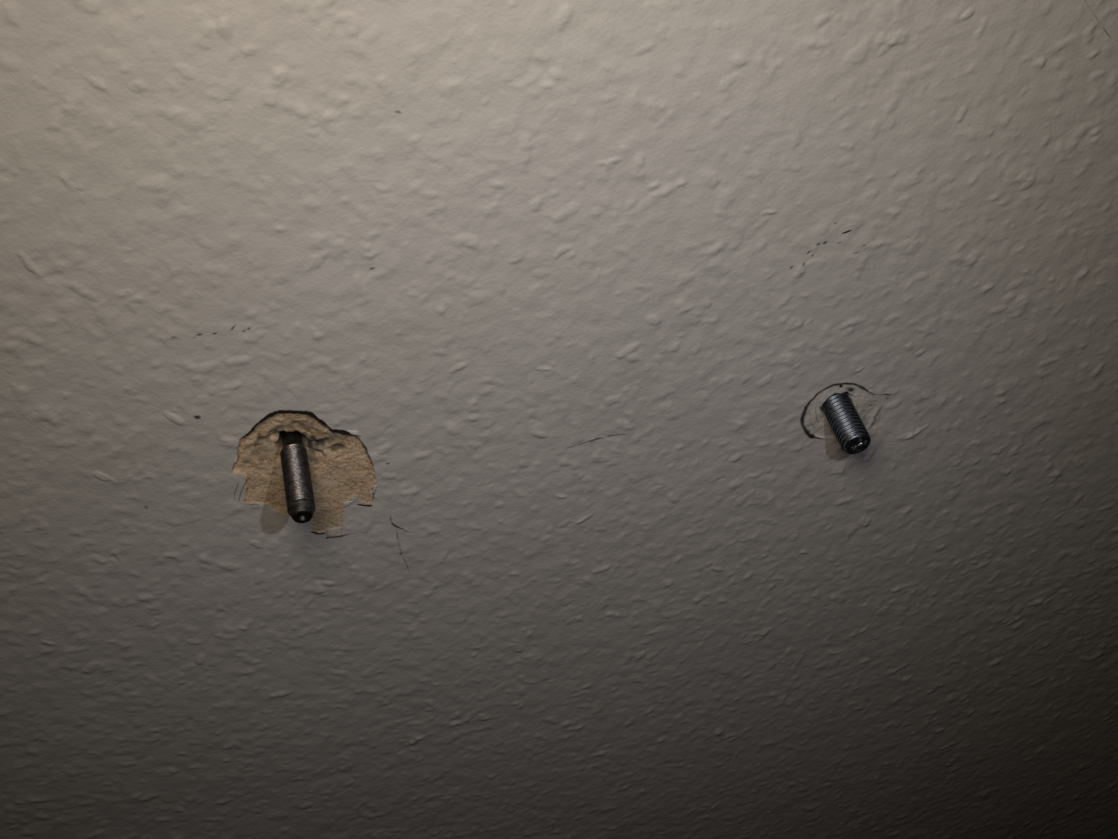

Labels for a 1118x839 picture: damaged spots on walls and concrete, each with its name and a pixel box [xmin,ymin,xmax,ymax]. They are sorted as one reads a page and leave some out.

spalling [231,410,377,539]